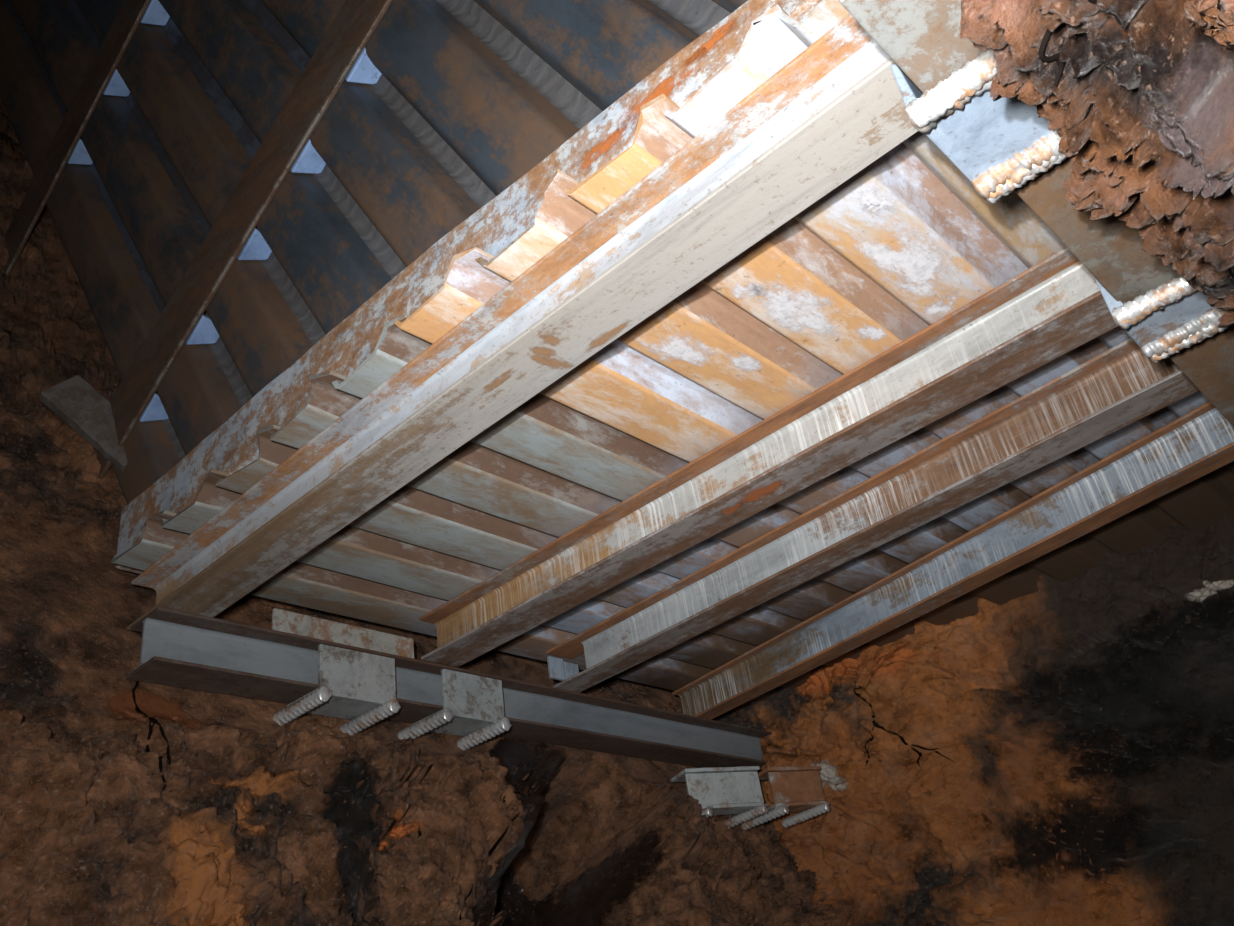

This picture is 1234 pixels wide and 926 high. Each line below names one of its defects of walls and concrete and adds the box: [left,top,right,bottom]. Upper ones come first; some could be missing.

peeling [855,228,957,314]
peeling [641,336,712,366]
peeling [732,354,760,370]
peeling [733,283,838,336]
peeling [858,326,885,340]
crack [131,681,171,782]
crack [854,686,955,776]